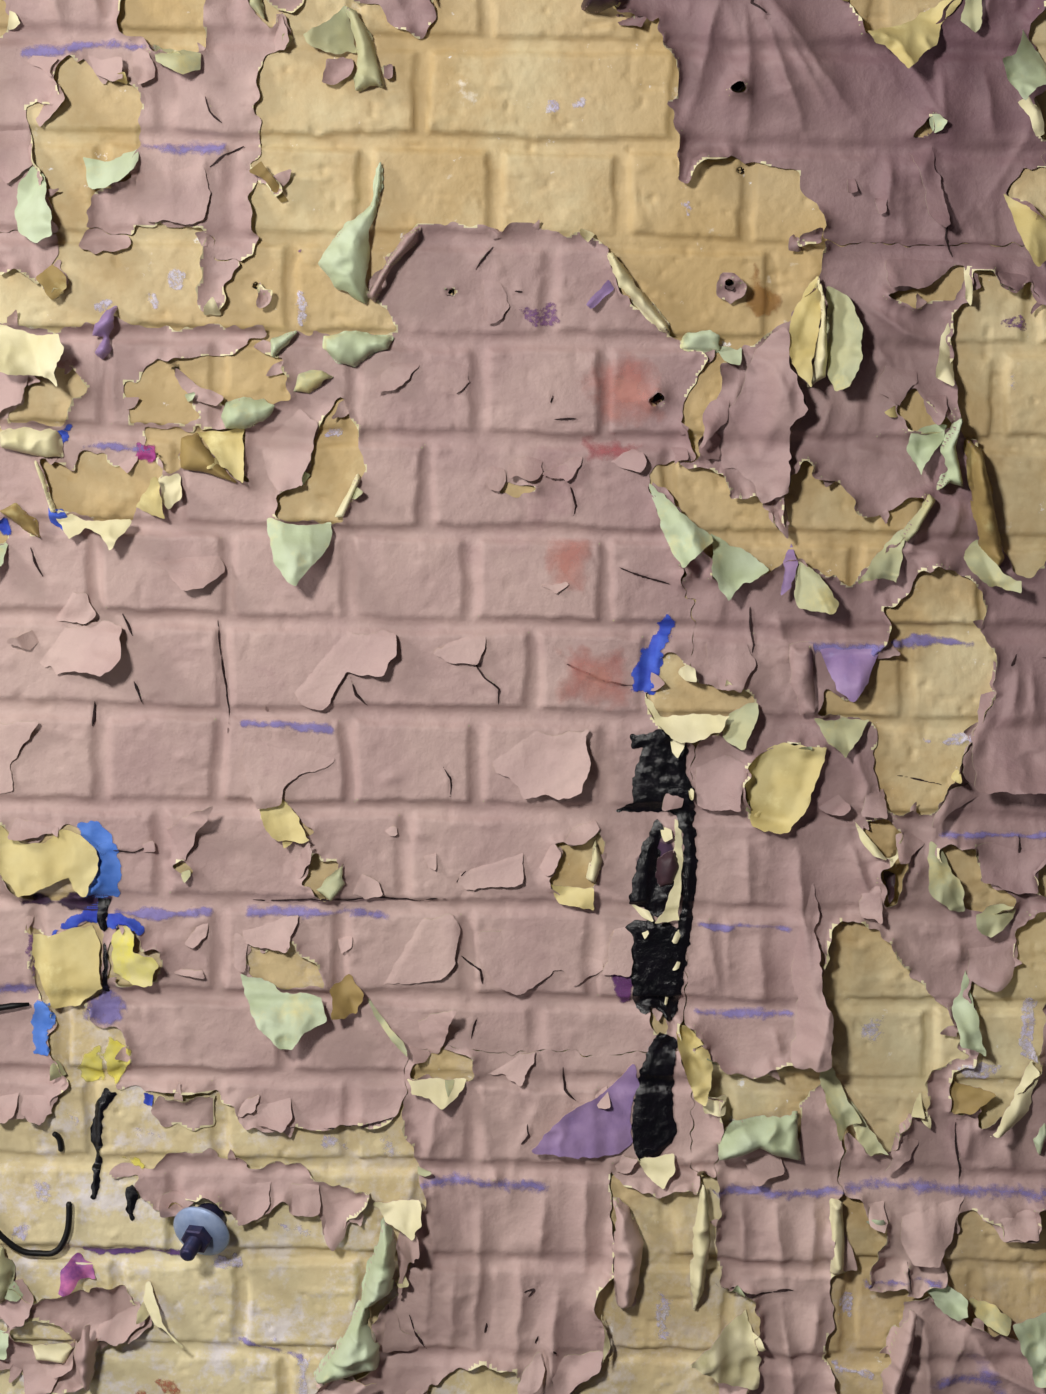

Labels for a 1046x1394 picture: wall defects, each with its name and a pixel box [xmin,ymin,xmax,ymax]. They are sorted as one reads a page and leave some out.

peeling [0,0,304,315]
peeling [303,0,436,92]
peeling [0,162,935,1394]
peeling [581,0,1046,1394]